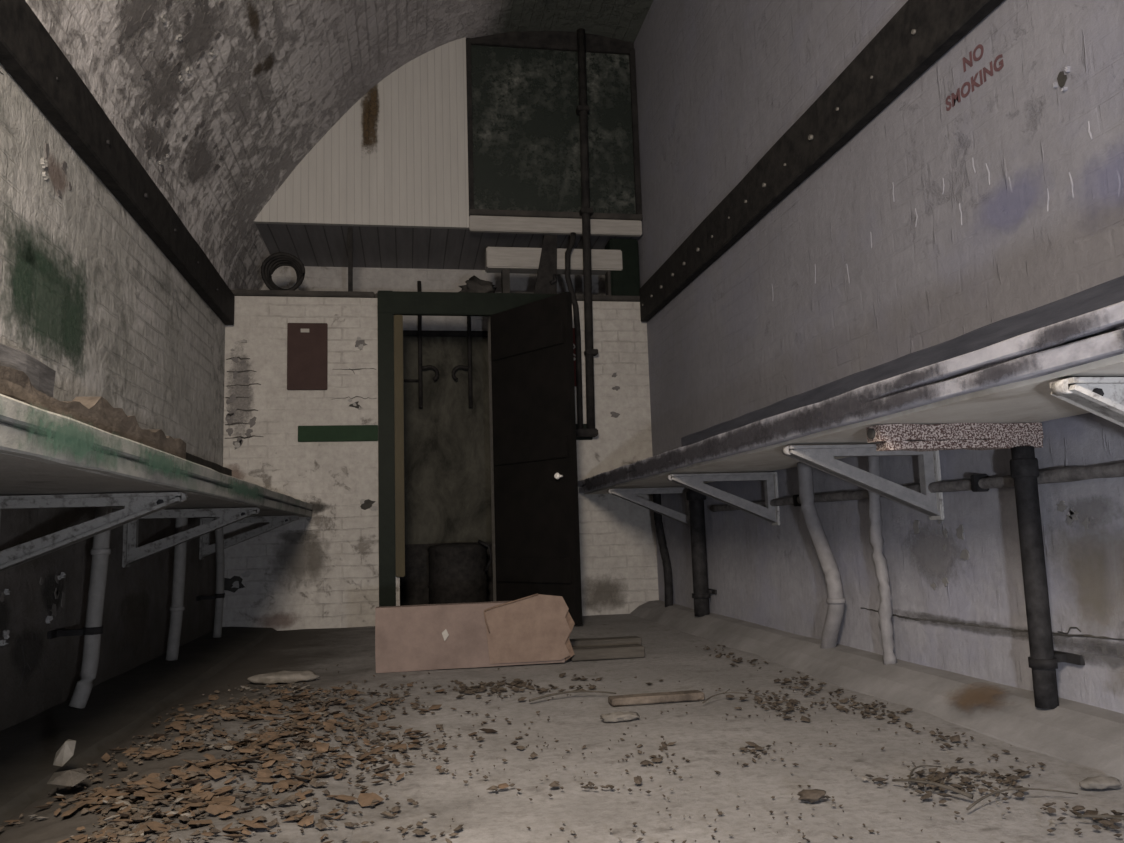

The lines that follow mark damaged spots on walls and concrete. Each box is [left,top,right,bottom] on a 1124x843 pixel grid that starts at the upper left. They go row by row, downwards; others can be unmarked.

leakage [6,226,87,369]
leakage [918,614,1029,638]